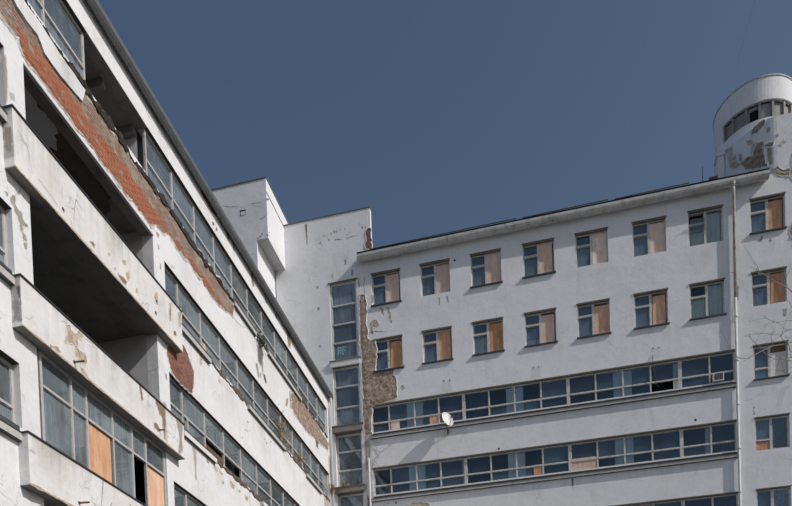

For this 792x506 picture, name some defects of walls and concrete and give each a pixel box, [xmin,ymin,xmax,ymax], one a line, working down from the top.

spalling [0,0,235,319]
spalling [725,119,792,181]
peeling [23,321,185,459]
spalling [15,165,207,395]
spalling [286,392,329,451]
spalling [361,226,373,250]
spalling [344,259,405,437]